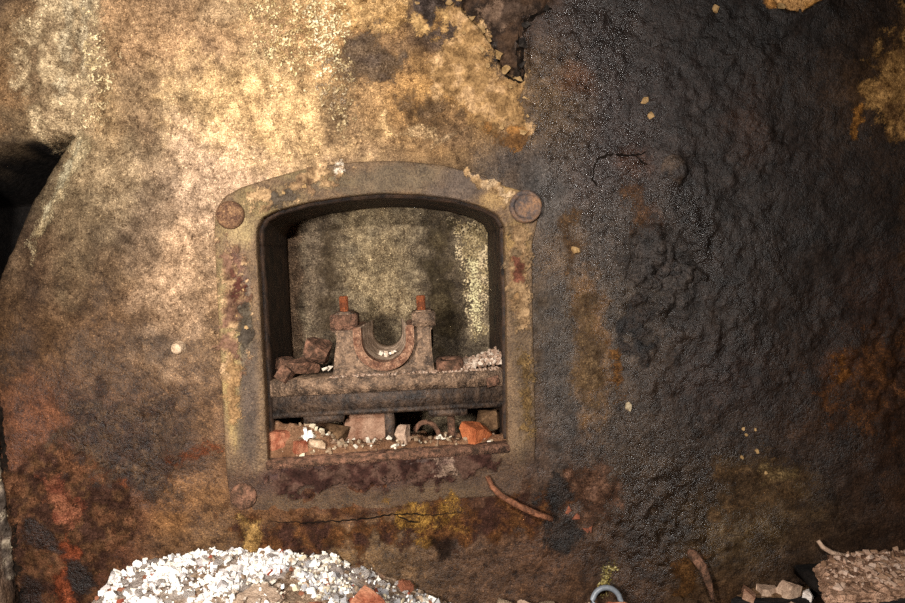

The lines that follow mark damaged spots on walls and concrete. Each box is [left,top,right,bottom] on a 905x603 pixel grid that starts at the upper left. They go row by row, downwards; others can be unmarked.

flaking render [338,0,553,153]
damp [850,27,905,142]
rust [411,419,442,435]
rust [1,431,138,603]
damp [532,473,584,554]
damp [698,449,816,533]